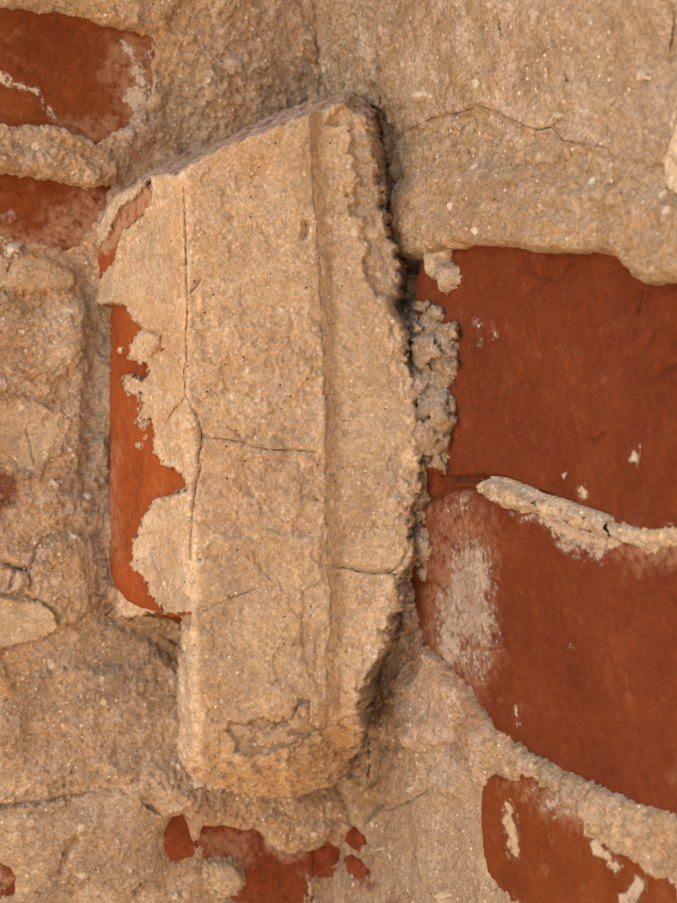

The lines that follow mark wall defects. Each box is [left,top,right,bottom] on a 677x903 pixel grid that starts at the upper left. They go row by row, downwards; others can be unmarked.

crack [378,106,601,182]
spalling [117,329,162,363]
spalling [127,392,150,450]
efflorescence [436,533,498,681]